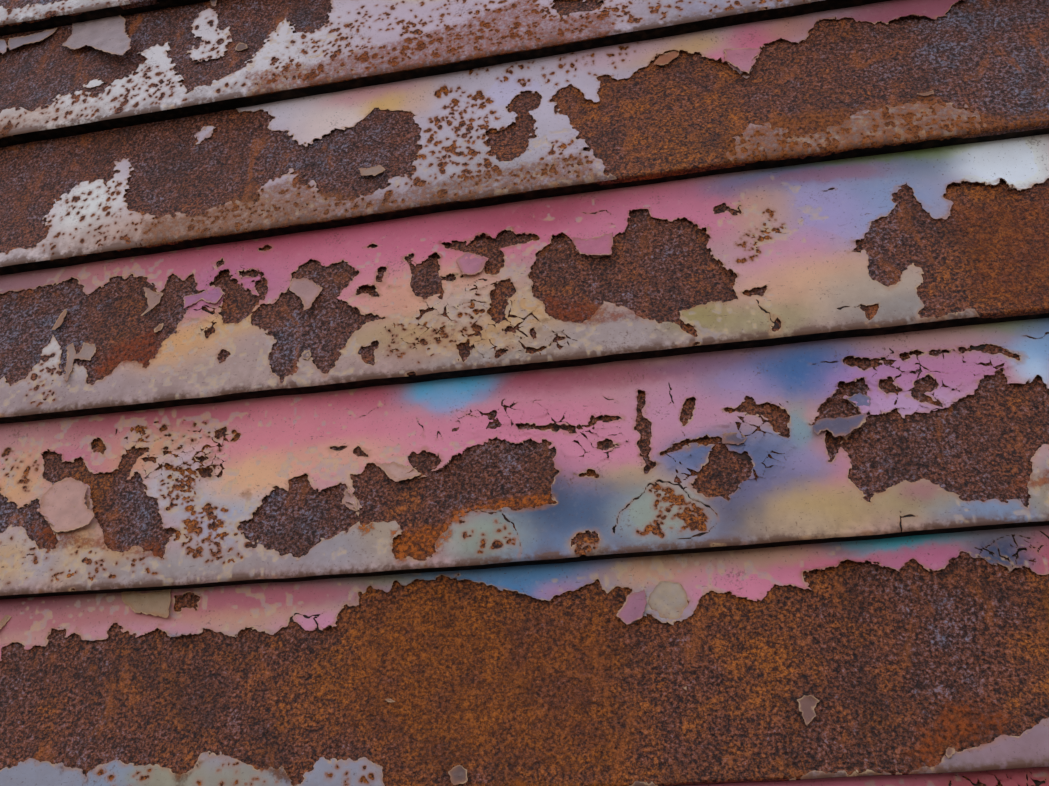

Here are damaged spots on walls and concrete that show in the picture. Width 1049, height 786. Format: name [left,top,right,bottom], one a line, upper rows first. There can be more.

peeling [0,0,333,113]
peeling [0,108,422,255]
peeling [487,0,1049,185]
corrosion [725,100,1049,163]
peeling [0,259,387,386]
crack [406,279,577,361]
peeling [405,209,767,337]
peeling [852,178,1049,323]
crack [418,397,628,458]
crack [612,403,790,539]
peeling [0,551,1049,786]
crack [949,768,1046,786]